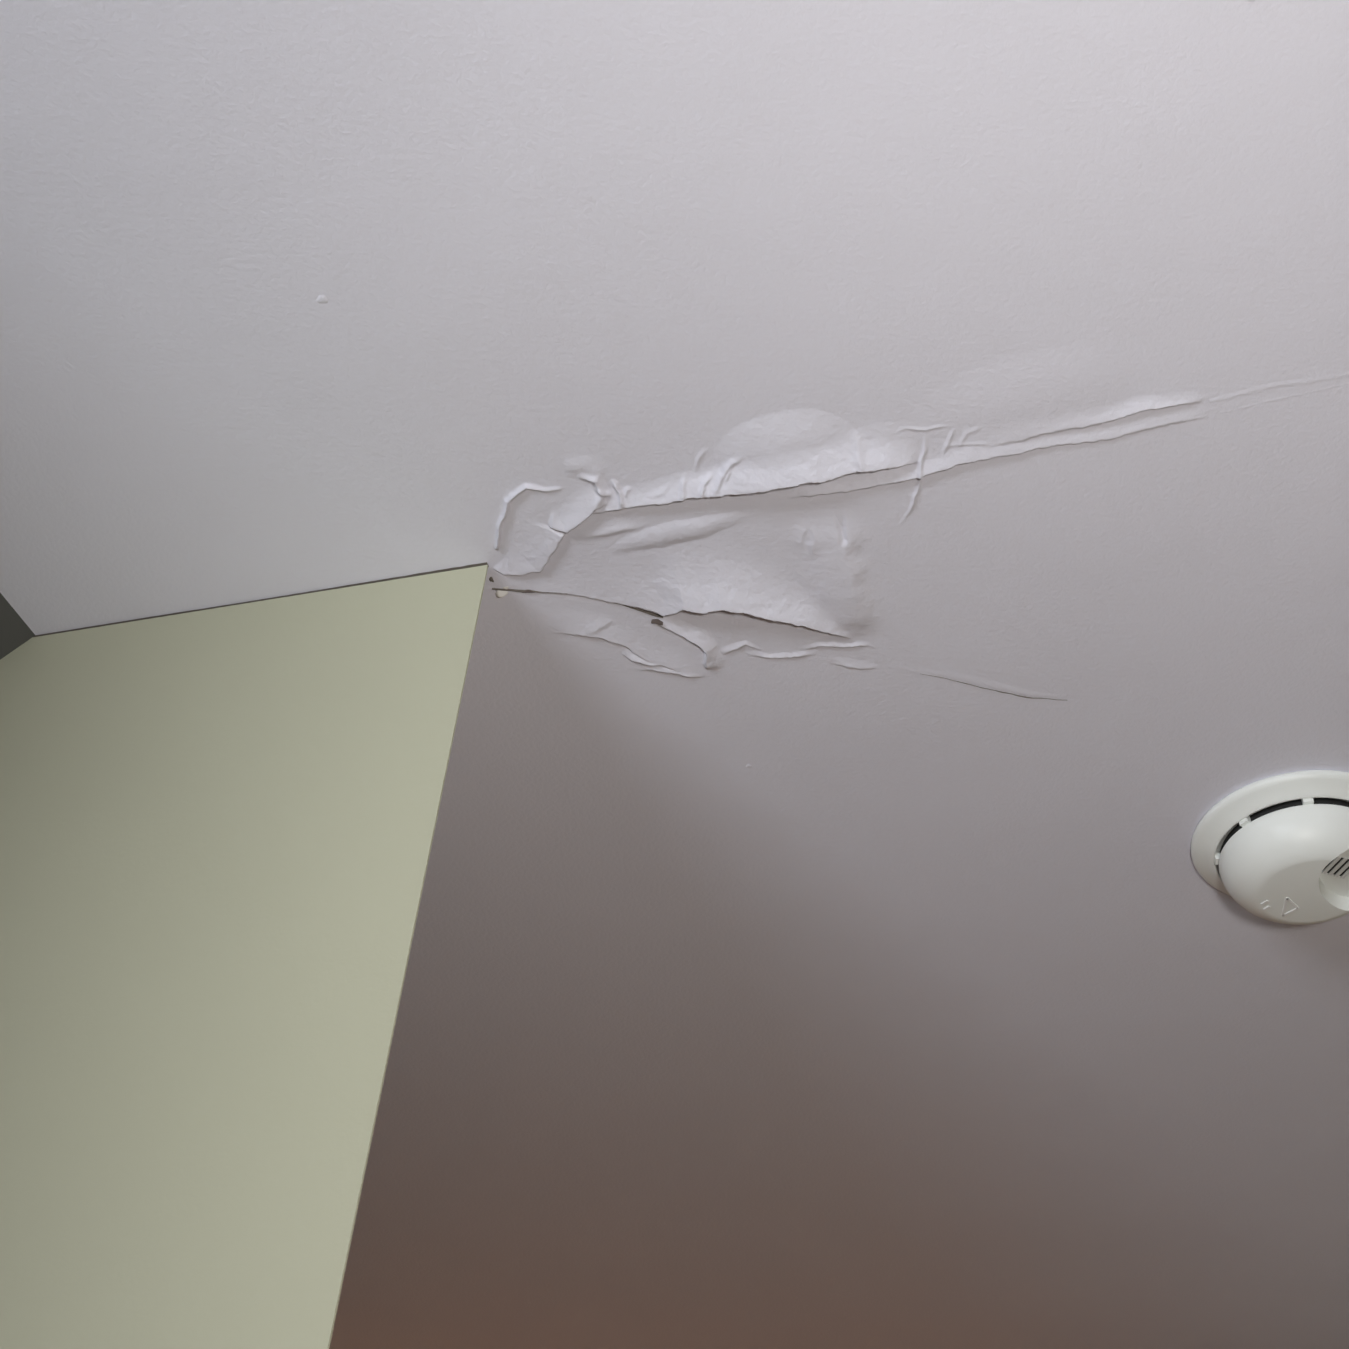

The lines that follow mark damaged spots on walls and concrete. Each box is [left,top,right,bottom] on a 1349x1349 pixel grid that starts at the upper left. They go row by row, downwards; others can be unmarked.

peeling [489,374,1215,678]
crack [881,663,1065,700]